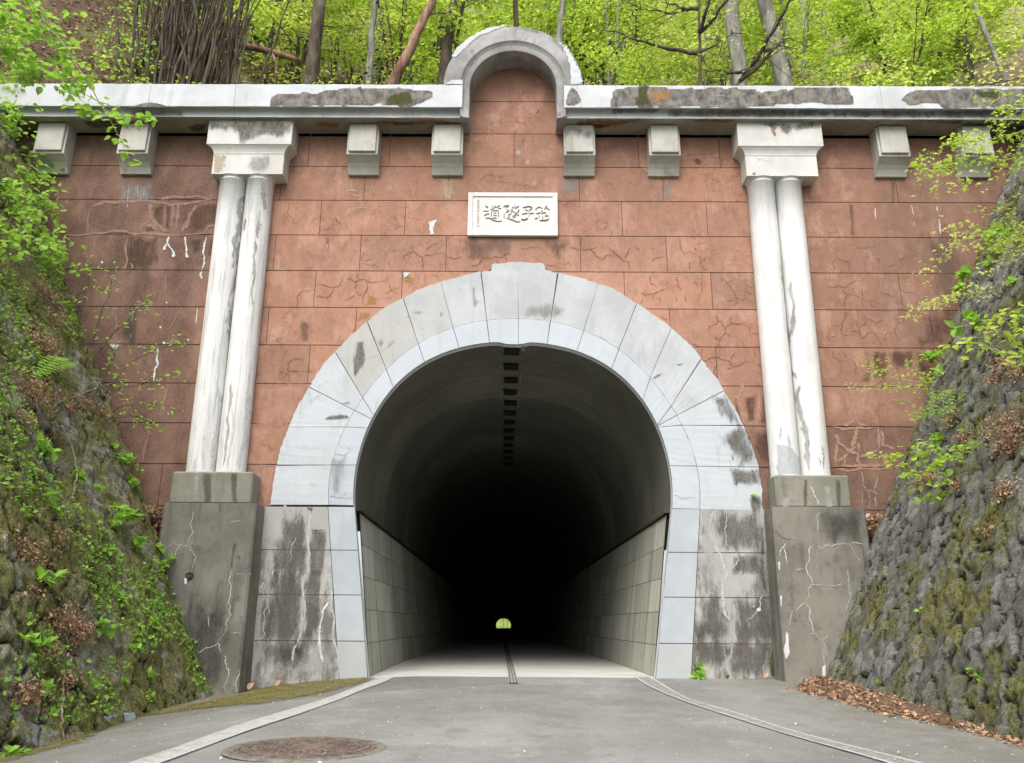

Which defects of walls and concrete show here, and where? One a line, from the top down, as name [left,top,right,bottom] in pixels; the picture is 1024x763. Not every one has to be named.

peeling [270,87,432,107]
peeling [610,85,854,113]
peeling [902,88,1024,109]
crack [59,195,215,270]
water stain [123,185,217,279]
water stain [354,342,364,375]
crack [297,220,760,424]
crack [827,246,913,472]
water stain [716,398,769,485]
water stain [259,511,332,674]
water stain [695,498,771,673]
crack [777,486,862,656]